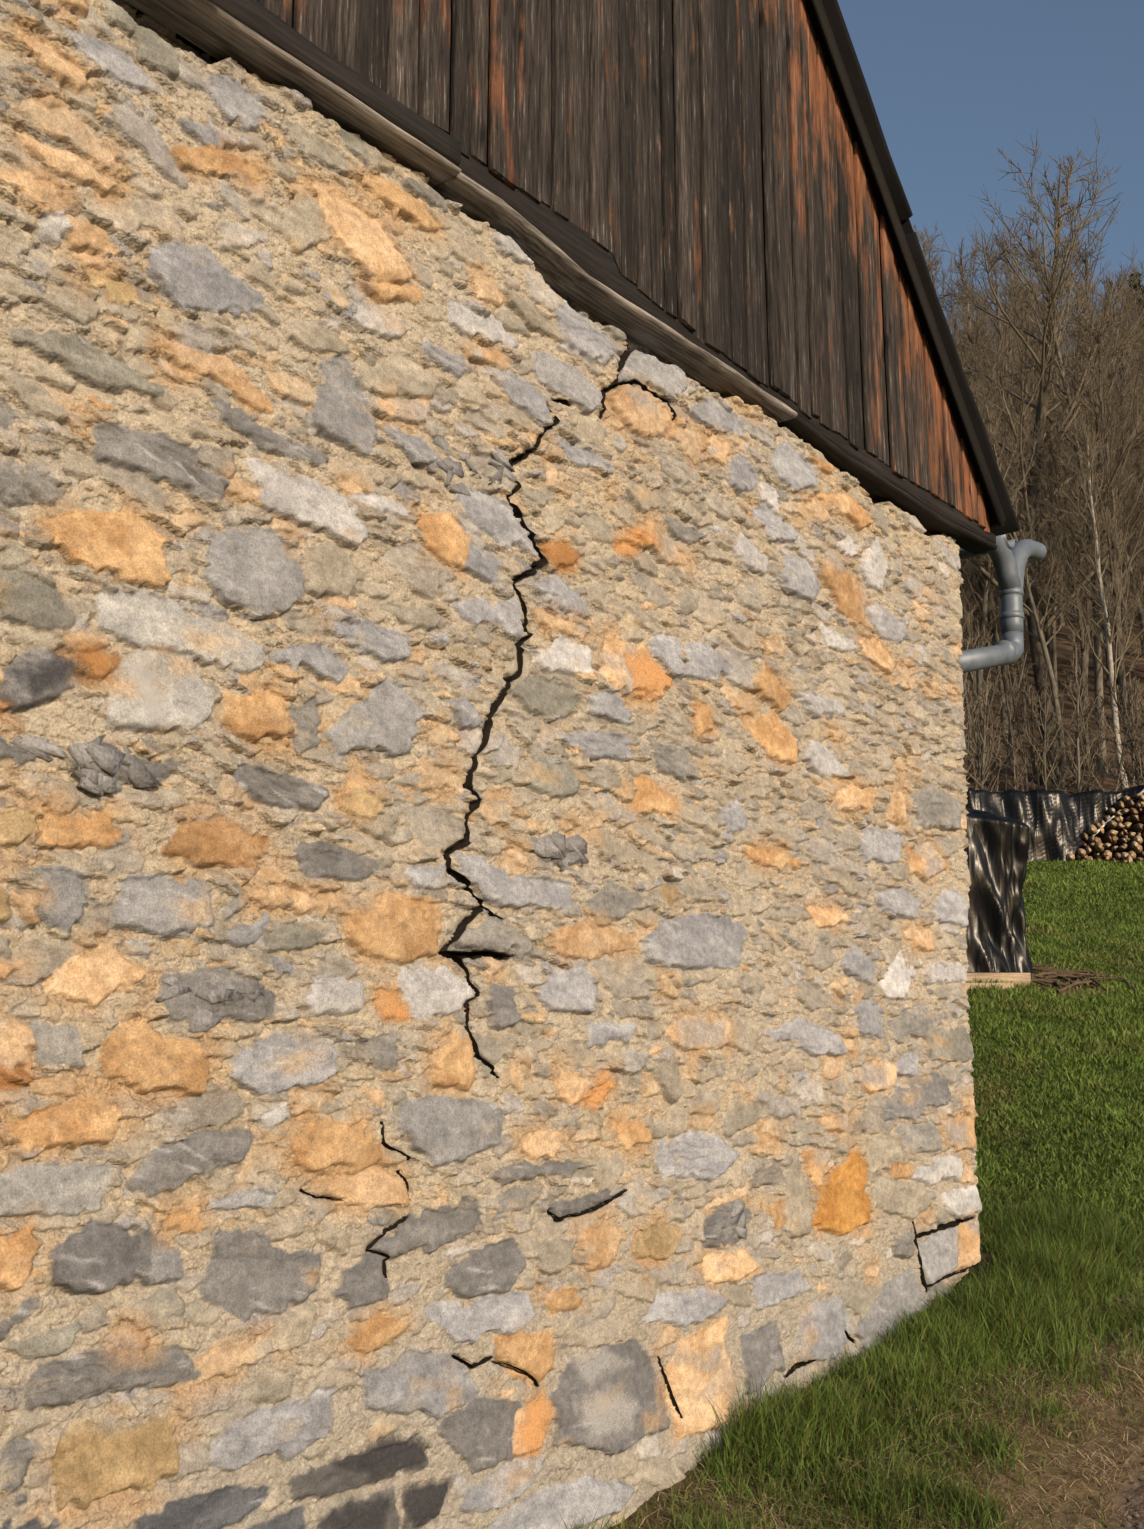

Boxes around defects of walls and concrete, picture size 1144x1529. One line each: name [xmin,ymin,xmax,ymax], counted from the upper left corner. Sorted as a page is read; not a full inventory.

crack [438,345,677,1078]
crack [299,1189,346,1201]
crack [365,1121,410,1278]
crack [912,1216,979,1292]
crack [451,1355,539,1387]